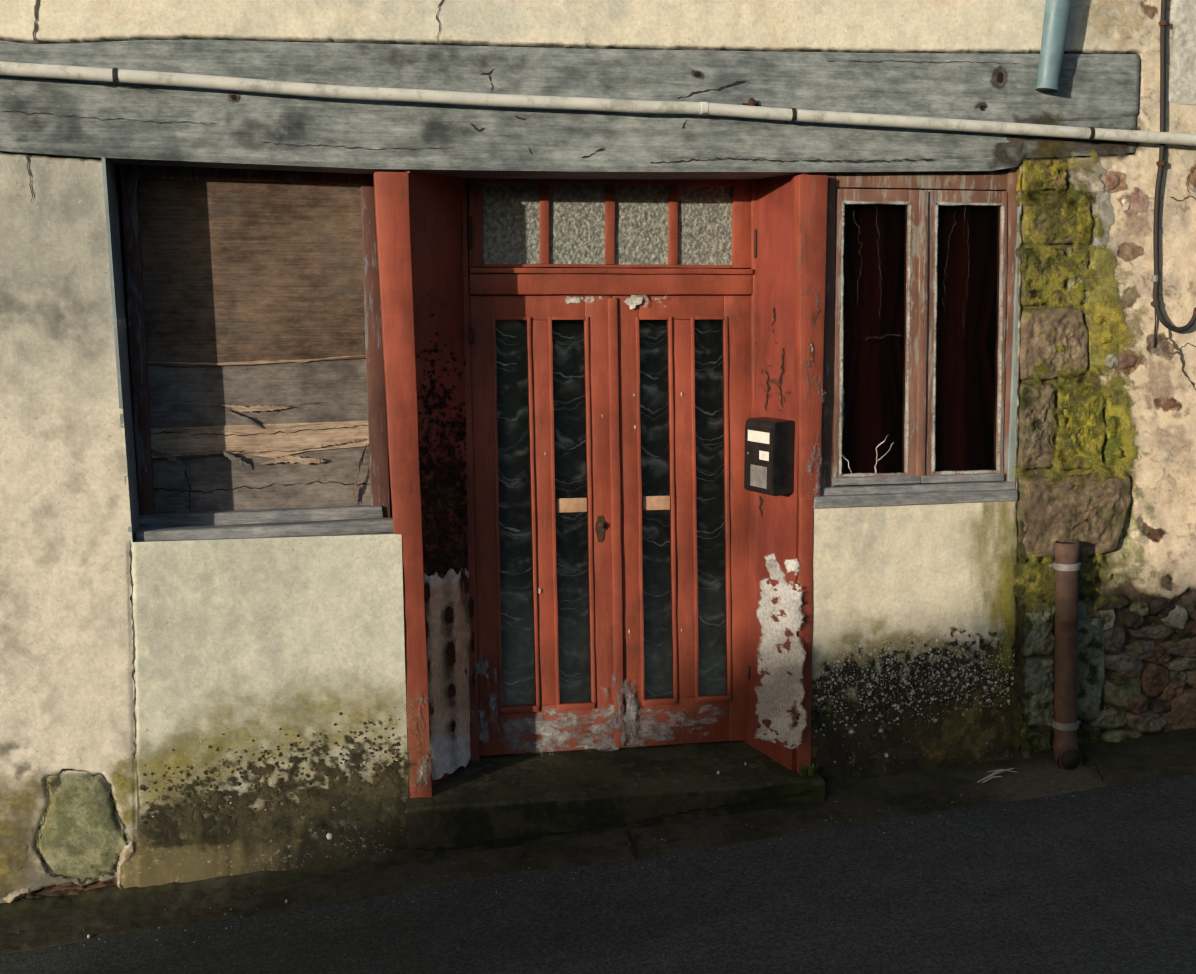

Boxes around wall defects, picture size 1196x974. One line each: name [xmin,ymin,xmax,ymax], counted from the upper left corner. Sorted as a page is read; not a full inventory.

crack [31,0,39,41]
flaking render [1101,171,1149,217]
flaking render [1105,328,1174,374]
crack [1152,329,1196,390]
flaking render [1141,520,1165,542]
peeling [471,654,725,753]
peeling [755,554,807,749]
leakage [811,502,1018,781]
flaking render [1085,574,1196,742]
leakage [133,694,413,848]
leakage [0,766,51,898]
flaking render [3,842,133,903]